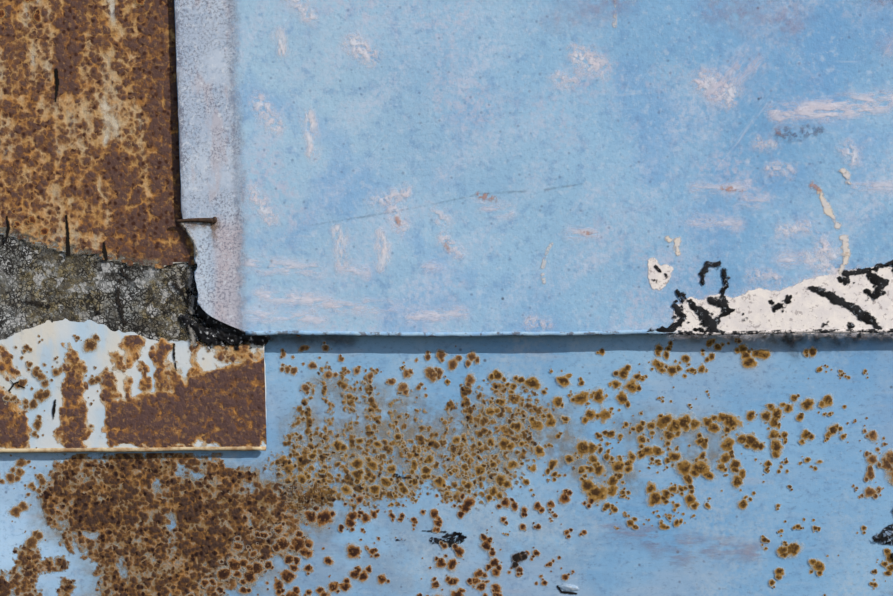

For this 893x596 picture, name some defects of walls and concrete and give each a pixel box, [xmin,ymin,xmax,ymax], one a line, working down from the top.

corrosion [0,0,215,268]
peeling [646,235,893,335]
corrosion [0,334,893,596]